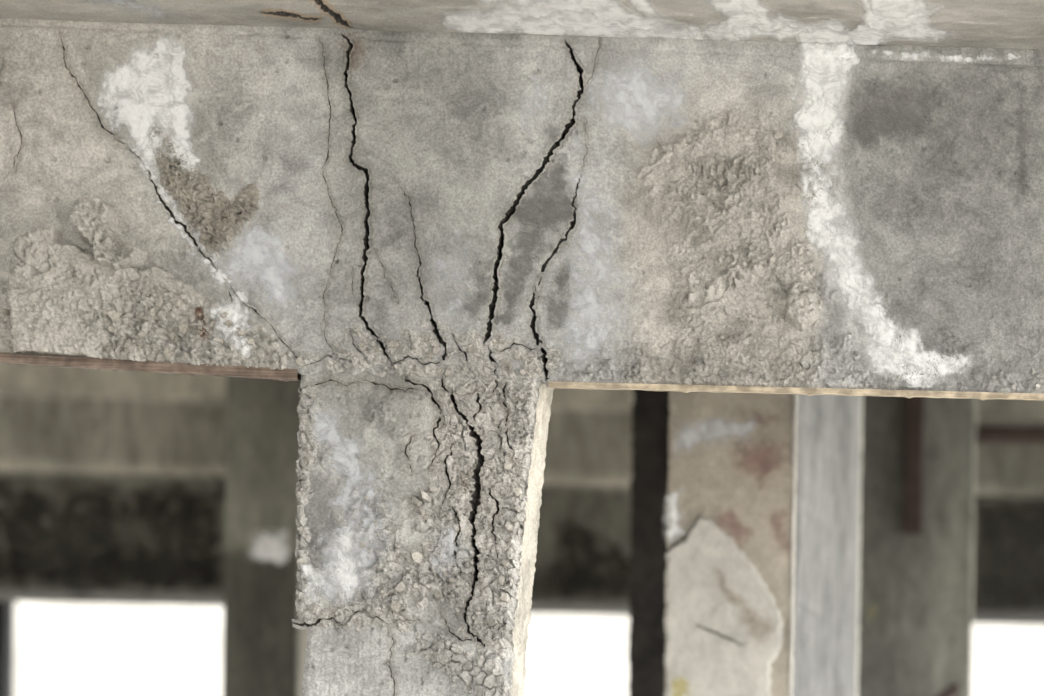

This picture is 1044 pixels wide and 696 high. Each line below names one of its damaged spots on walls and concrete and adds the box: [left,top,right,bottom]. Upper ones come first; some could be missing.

crack [0,59,24,172]
water stain [97,38,296,357]
crack [59,0,602,696]
spalling [251,315,1044,696]
water stain [443,0,992,388]